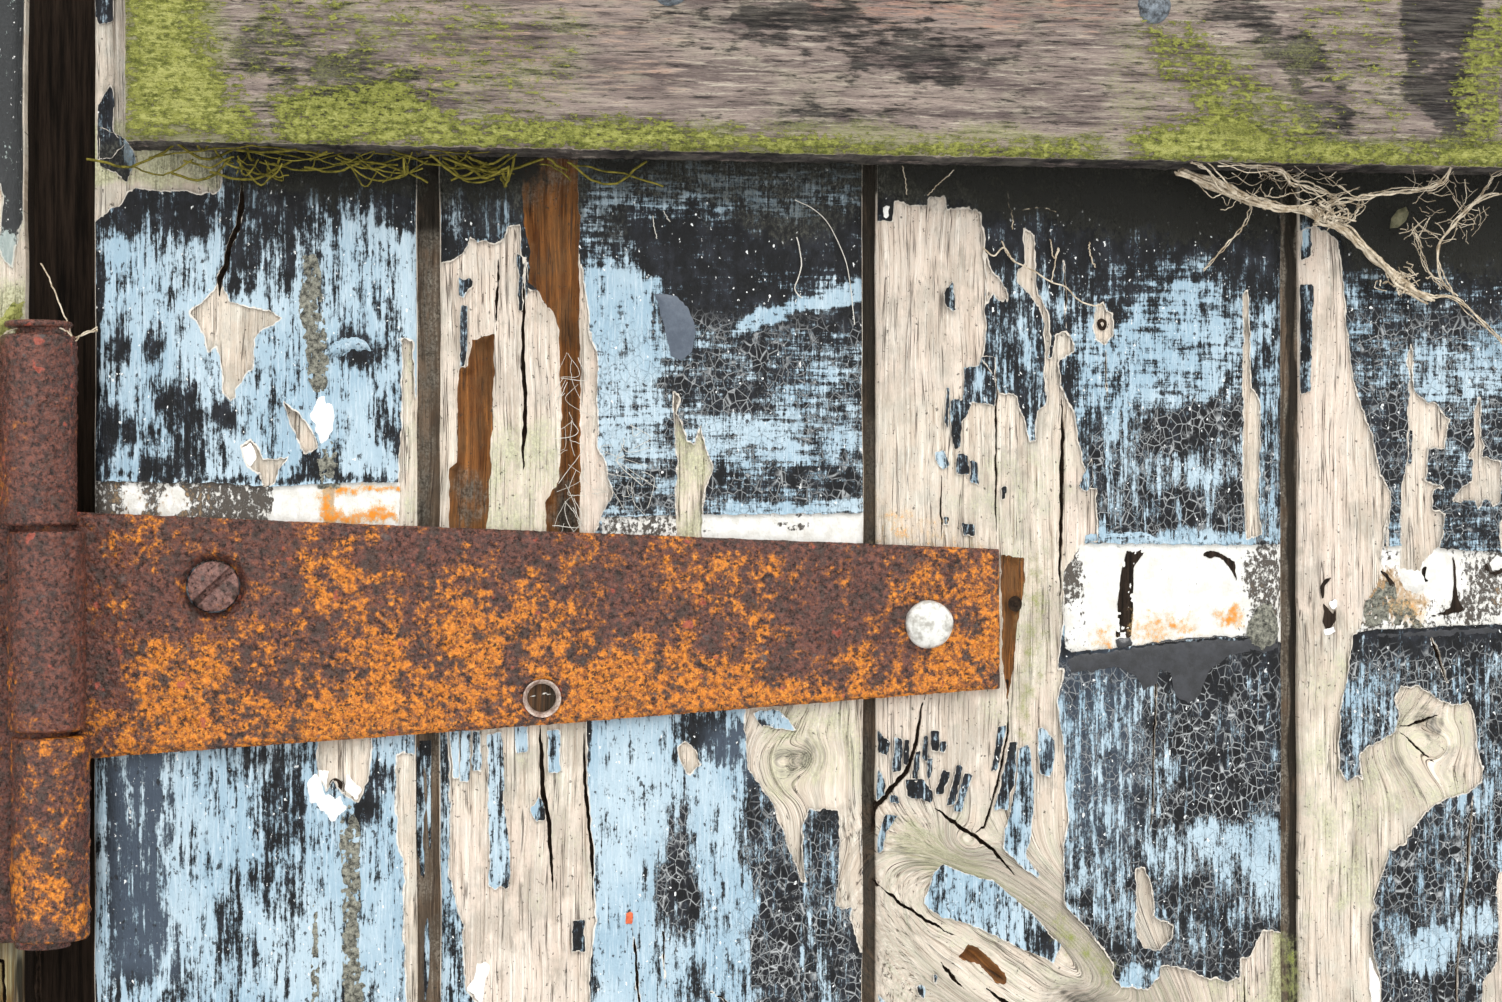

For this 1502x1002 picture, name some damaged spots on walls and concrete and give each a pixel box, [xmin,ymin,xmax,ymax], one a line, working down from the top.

peeling [0,221,25,337]
peeling [95,338,417,526]
corrosion [318,484,400,525]
peeling [440,197,1281,1002]
peeling [1298,227,1502,1002]
peeling [307,738,371,821]
crack [871,702,923,832]
crack [1149,684,1157,822]
crack [1400,715,1436,761]
peeling [396,753,417,1002]
crack [632,930,665,1002]
crack [1455,812,1471,1001]